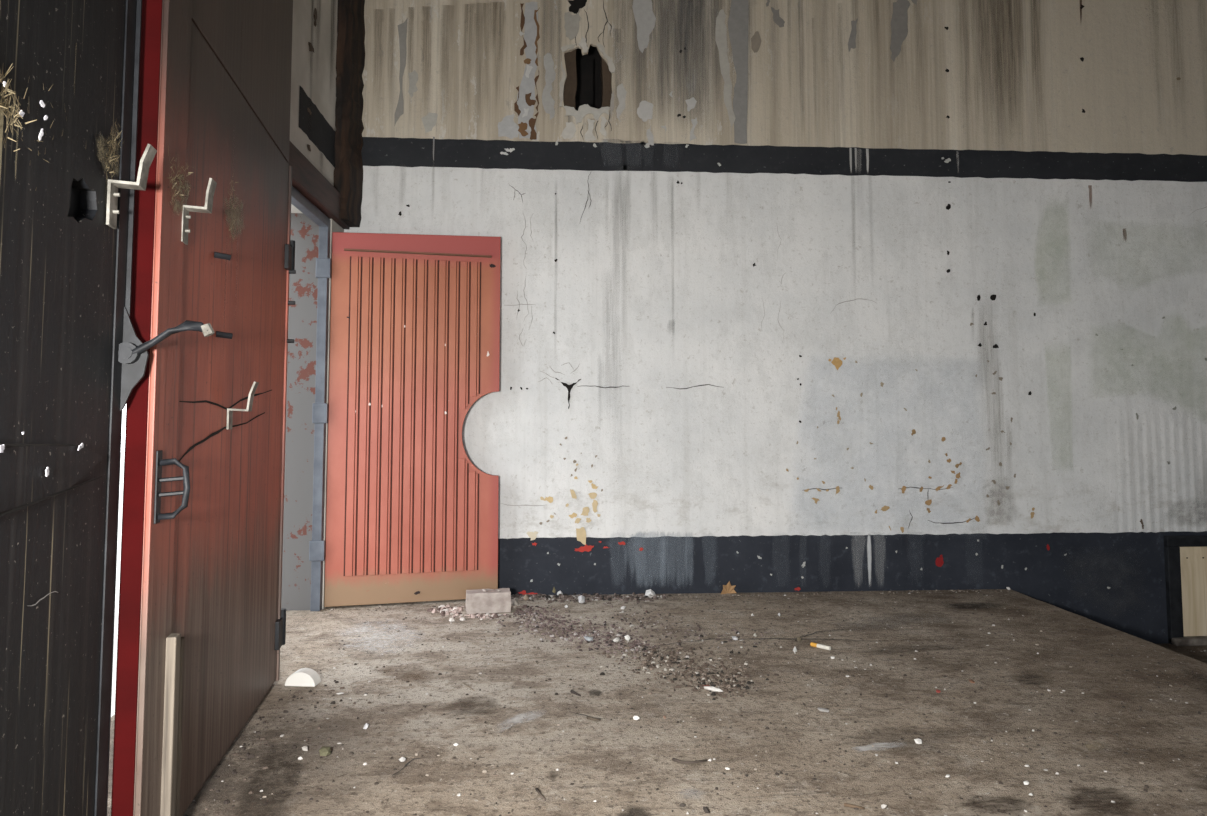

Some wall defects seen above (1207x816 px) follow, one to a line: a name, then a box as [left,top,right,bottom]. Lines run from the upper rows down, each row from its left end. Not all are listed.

peeling [848,18,858,51]
peeling [890,0,917,62]
peeling [498,0,667,155]
peeling [715,0,761,144]
crack [538,363,630,409]